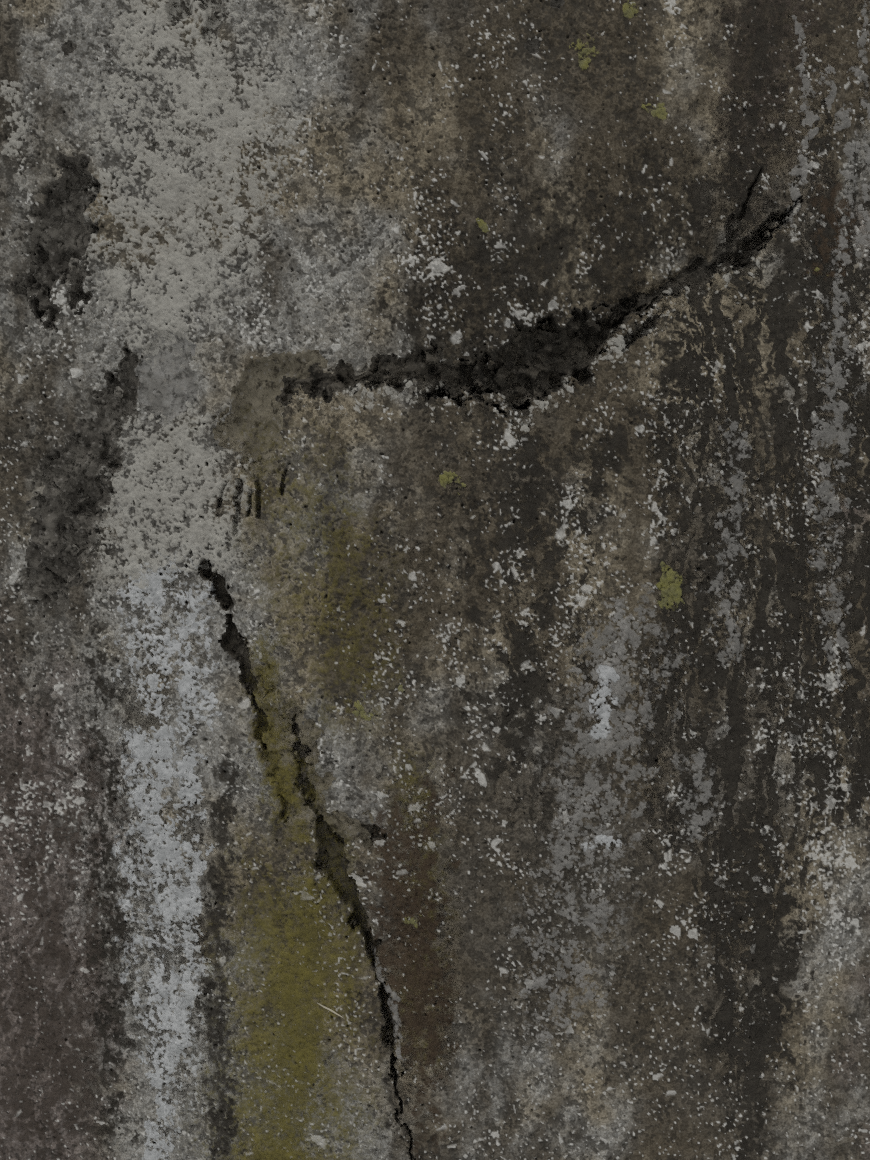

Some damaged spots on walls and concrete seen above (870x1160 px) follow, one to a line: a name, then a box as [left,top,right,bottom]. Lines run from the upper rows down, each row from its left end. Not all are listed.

spalling [10,152,103,330]
crack [275,167,804,432]
crack [198,560,416,1160]